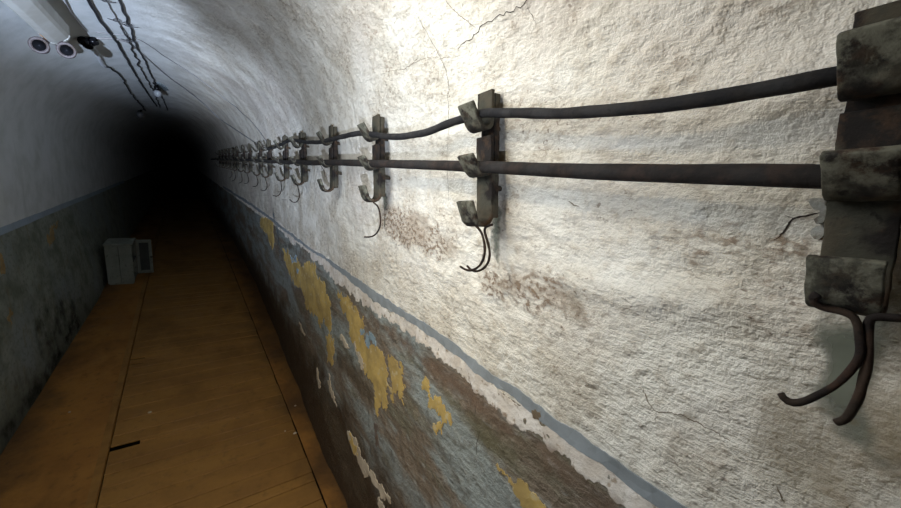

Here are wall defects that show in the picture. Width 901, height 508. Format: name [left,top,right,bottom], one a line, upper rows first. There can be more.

crack [387,0,536,149]
peeling [236,196,658,508]